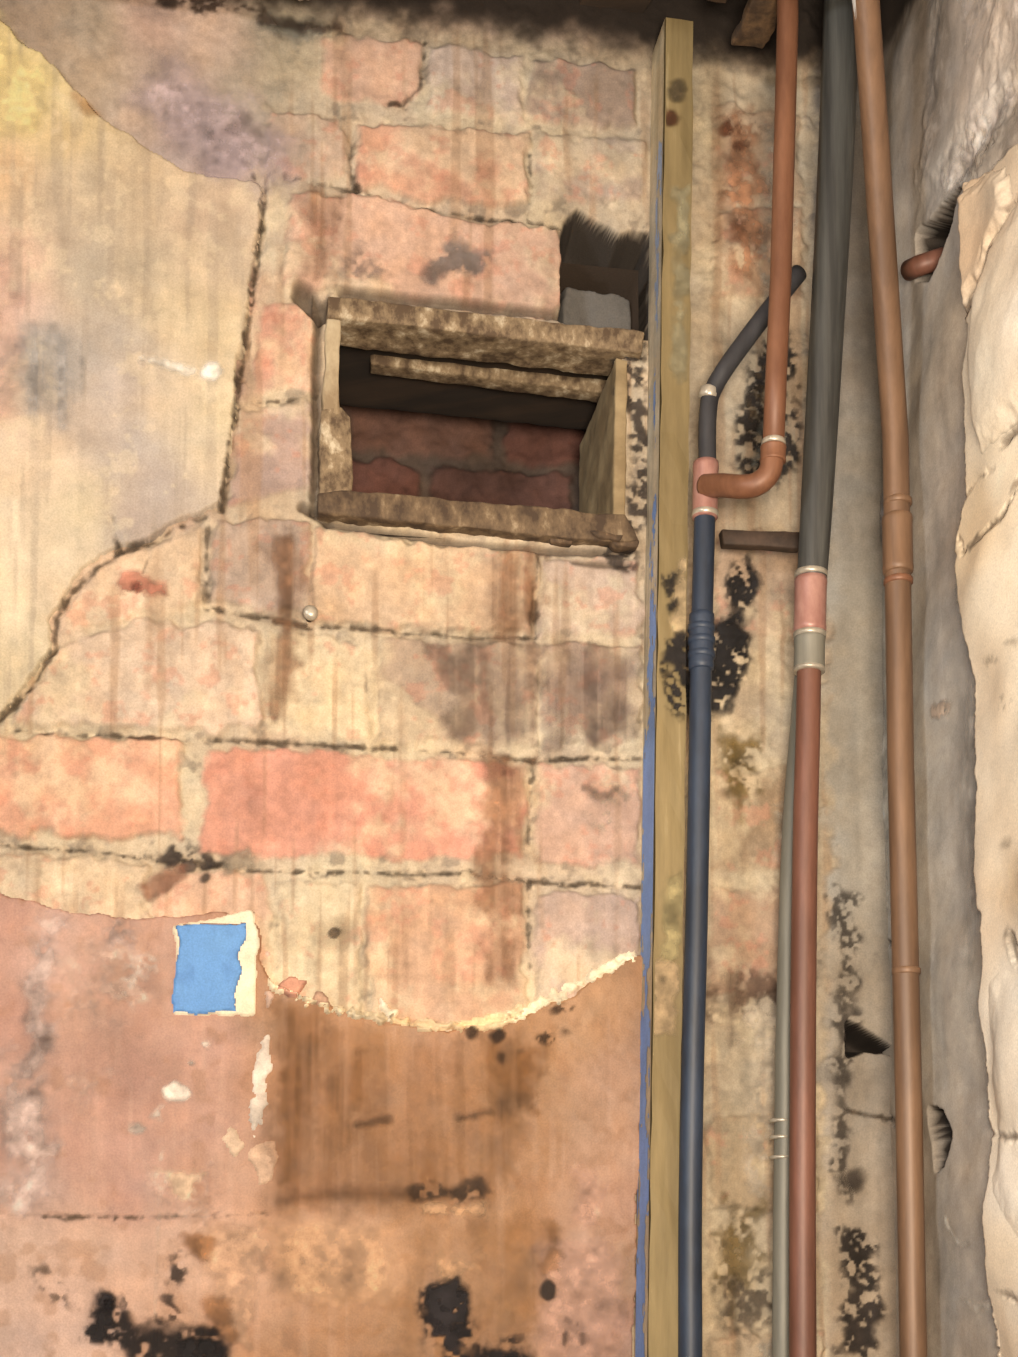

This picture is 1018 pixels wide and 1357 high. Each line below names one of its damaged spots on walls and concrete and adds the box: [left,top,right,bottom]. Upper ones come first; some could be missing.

crack [341,150,361,194]
crack [427,208,557,230]
crack [0,174,296,735]
damp [735,341,767,474]
spalling [118,571,166,594]
crack [206,594,538,641]
spalling [142,845,253,900]
peeling [172,910,330,1017]
peeling [222,1035,279,1185]
damp [85,1265,236,1357]
damp [419,1261,527,1357]
damp [836,1226,884,1357]